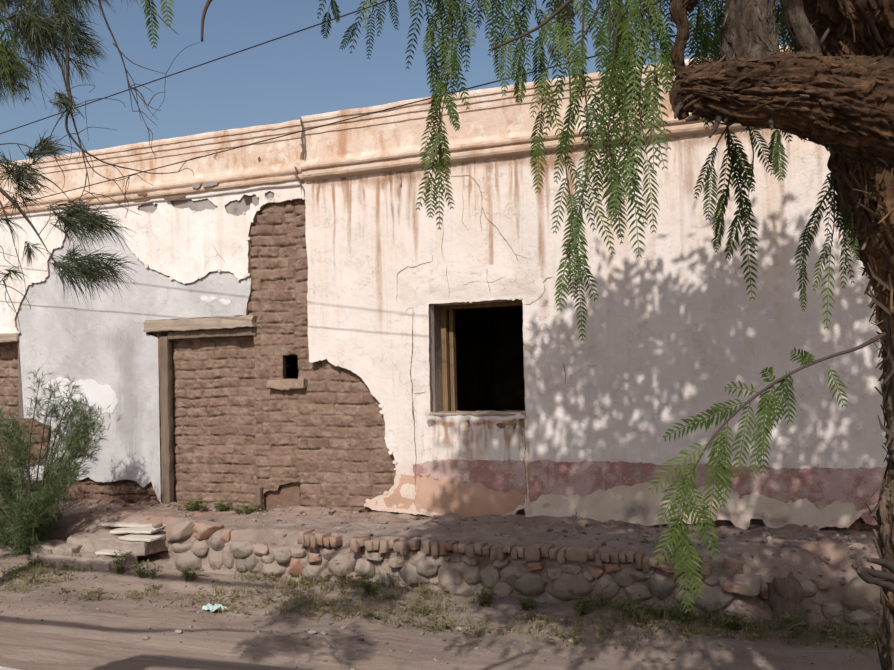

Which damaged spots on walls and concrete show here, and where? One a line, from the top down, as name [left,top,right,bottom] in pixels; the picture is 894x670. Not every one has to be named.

crack [397,175,526,275]
peeling [16,181,488,512]
crack [396,297,423,503]
peeling [494,482,860,526]